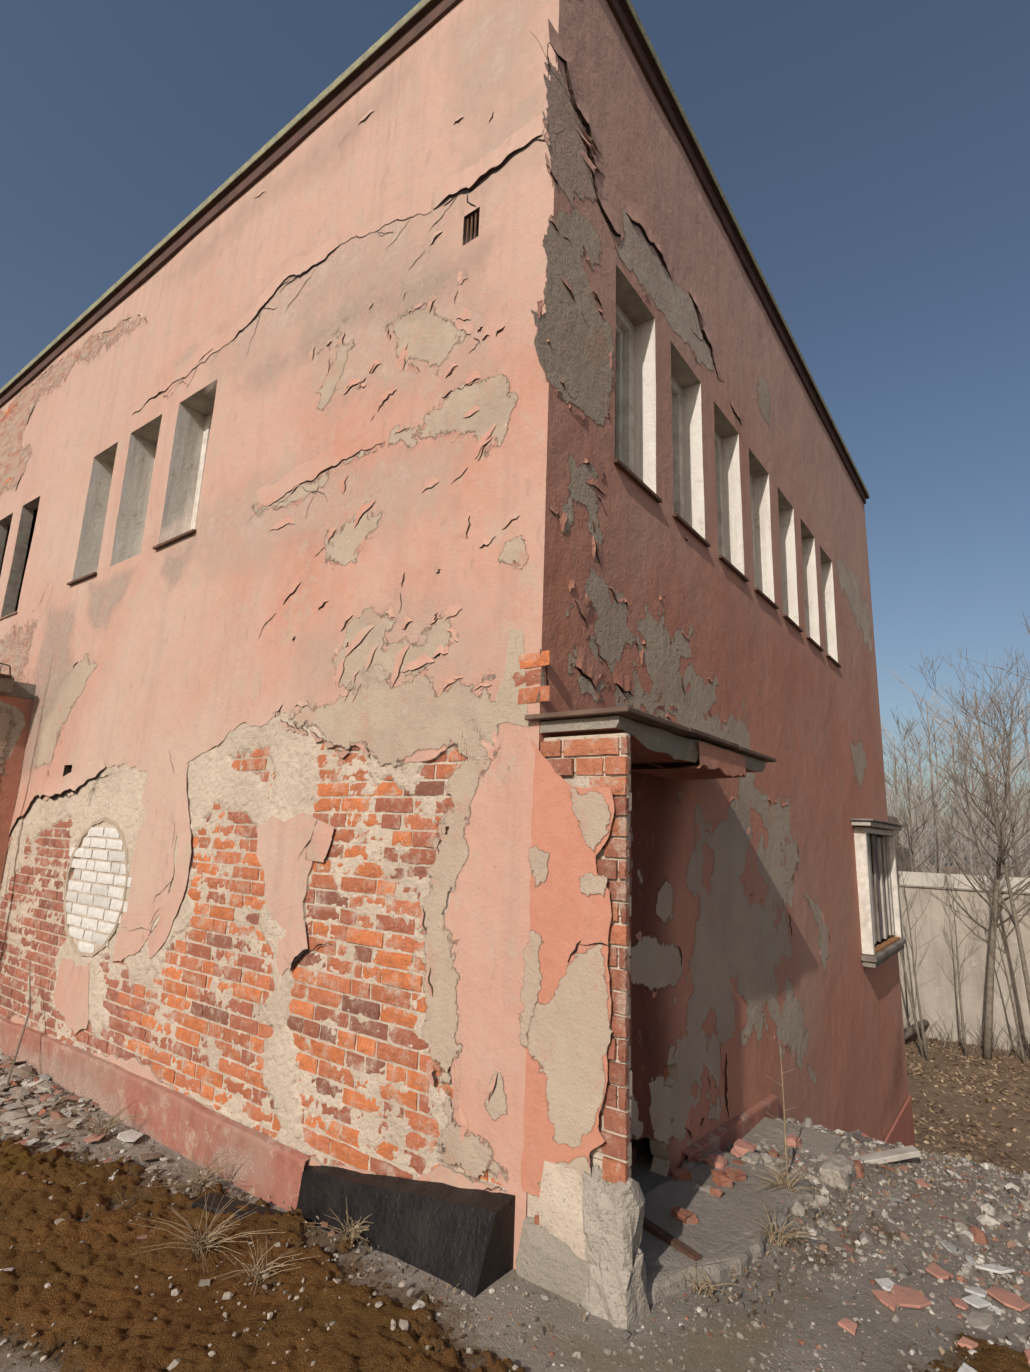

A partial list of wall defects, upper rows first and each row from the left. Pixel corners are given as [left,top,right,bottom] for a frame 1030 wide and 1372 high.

peeling [337,107,374,147]
crack [132,19,744,439]
peeling [523,44,713,425]
peeling [252,270,518,531]
peeling [317,500,382,566]
peeling [549,455,750,749]
crack [9,752,110,838]
spalling [0,572,550,1193]
peeling [519,930,613,1177]
peeling [567,787,610,852]
peeling [579,873,608,897]
peeling [631,772,830,1175]